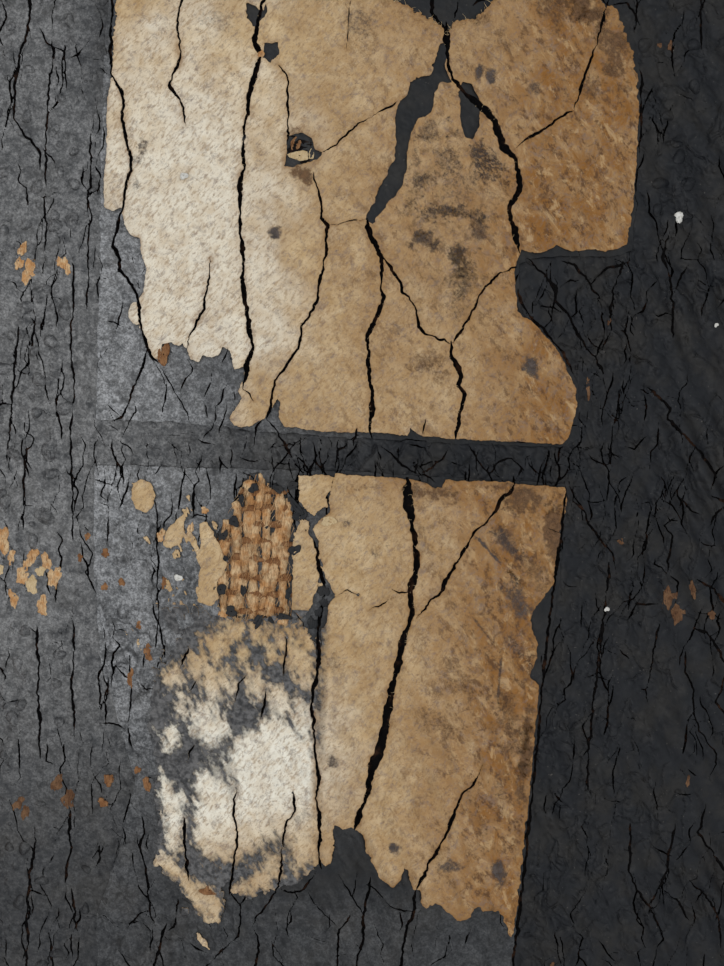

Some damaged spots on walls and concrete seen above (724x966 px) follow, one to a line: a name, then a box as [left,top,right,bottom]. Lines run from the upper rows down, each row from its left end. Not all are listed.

crack [12,0,67,246]
crack [0,291,38,527]
peeling [128,302,140,328]
peeling [157,343,170,366]
crack [69,0,330,537]
peeling [212,473,307,629]
peeling [321,516,338,526]
crack [328,0,639,829]
crack [34,627,42,758]
damp [143,604,326,919]
crack [206,541,478,966]
crack [512,493,616,966]